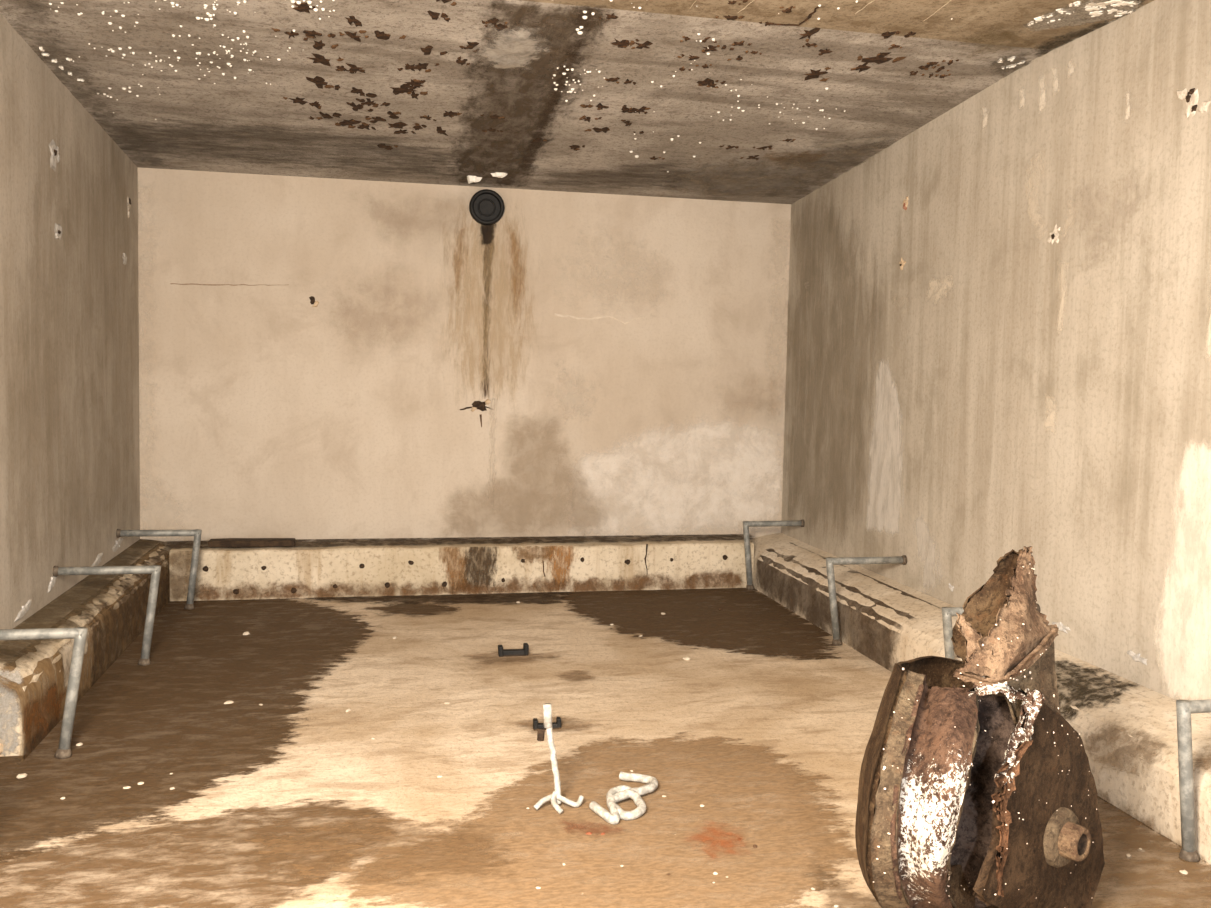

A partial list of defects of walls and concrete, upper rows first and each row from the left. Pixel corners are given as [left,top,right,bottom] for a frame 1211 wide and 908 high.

water stain [456,1,609,187]
water stain [1020,64,1074,111]
water stain [991,0,1143,76]
rust [481,223,496,396]
water stain [295,423,780,547]
water stain [866,361,902,535]
rust [443,546,497,592]
rust [514,546,573,591]
water stain [1156,444,1211,700]
water stain [0,486,939,908]
water stain [1055,660,1136,720]
water stain [1091,796,1211,908]